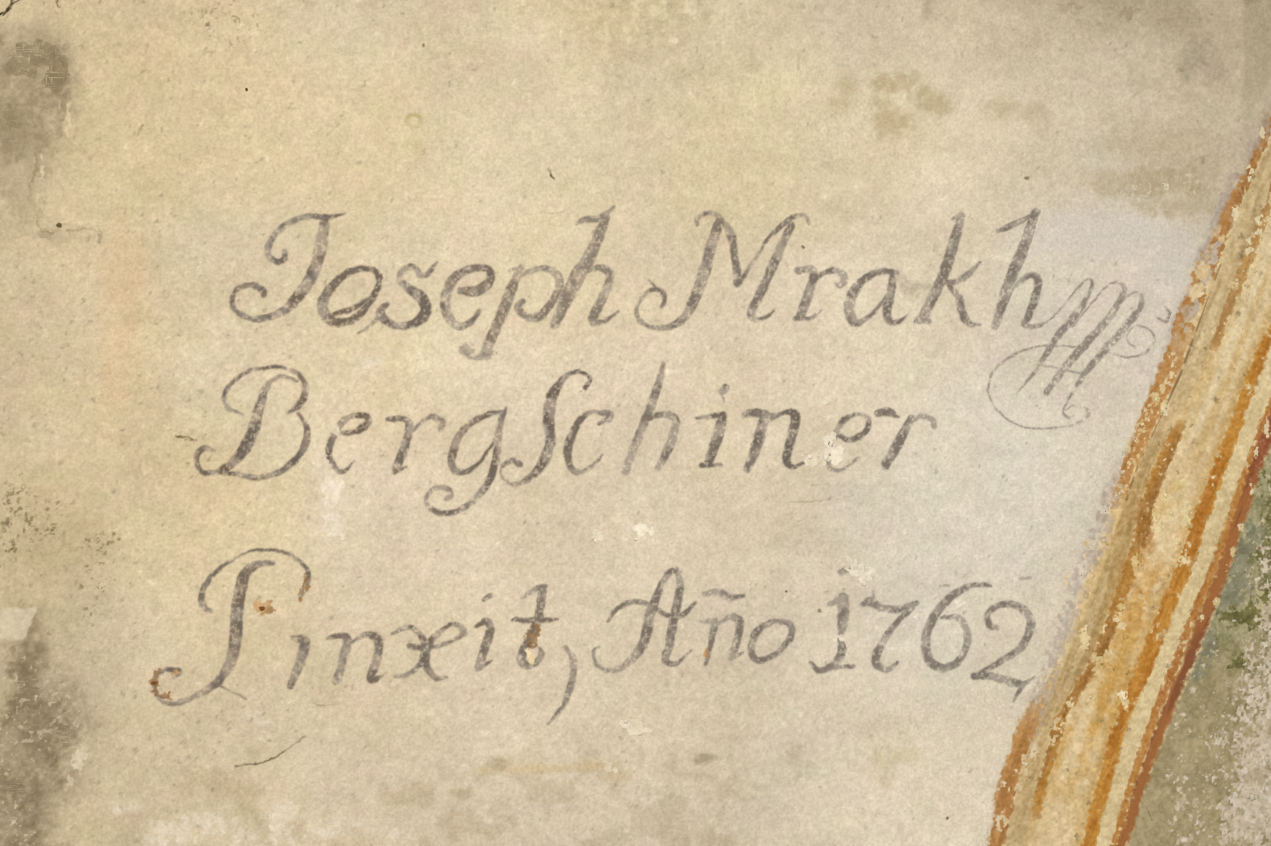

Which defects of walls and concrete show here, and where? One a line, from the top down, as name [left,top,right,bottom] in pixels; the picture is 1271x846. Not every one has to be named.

crack [0,0,21,16]
damp [185,0,273,61]
damp [0,0,91,279]
peeling [1149,473,1192,575]
flaking render [1164,415,1271,846]
damp [0,655,80,846]